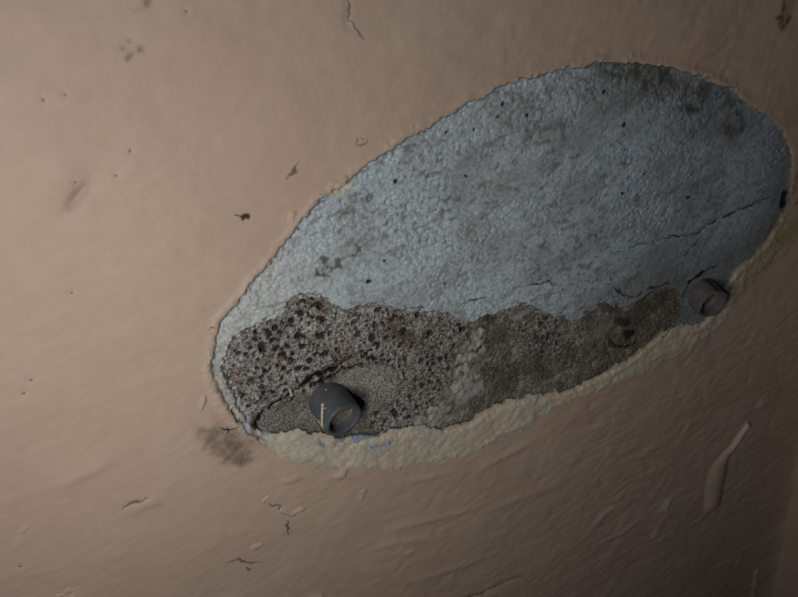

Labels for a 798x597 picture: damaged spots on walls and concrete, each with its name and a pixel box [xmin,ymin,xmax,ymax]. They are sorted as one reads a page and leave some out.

crack [611,197,768,256]
flaking render [206,61,798,473]
crack [597,266,715,298]
water stain [189,409,265,472]